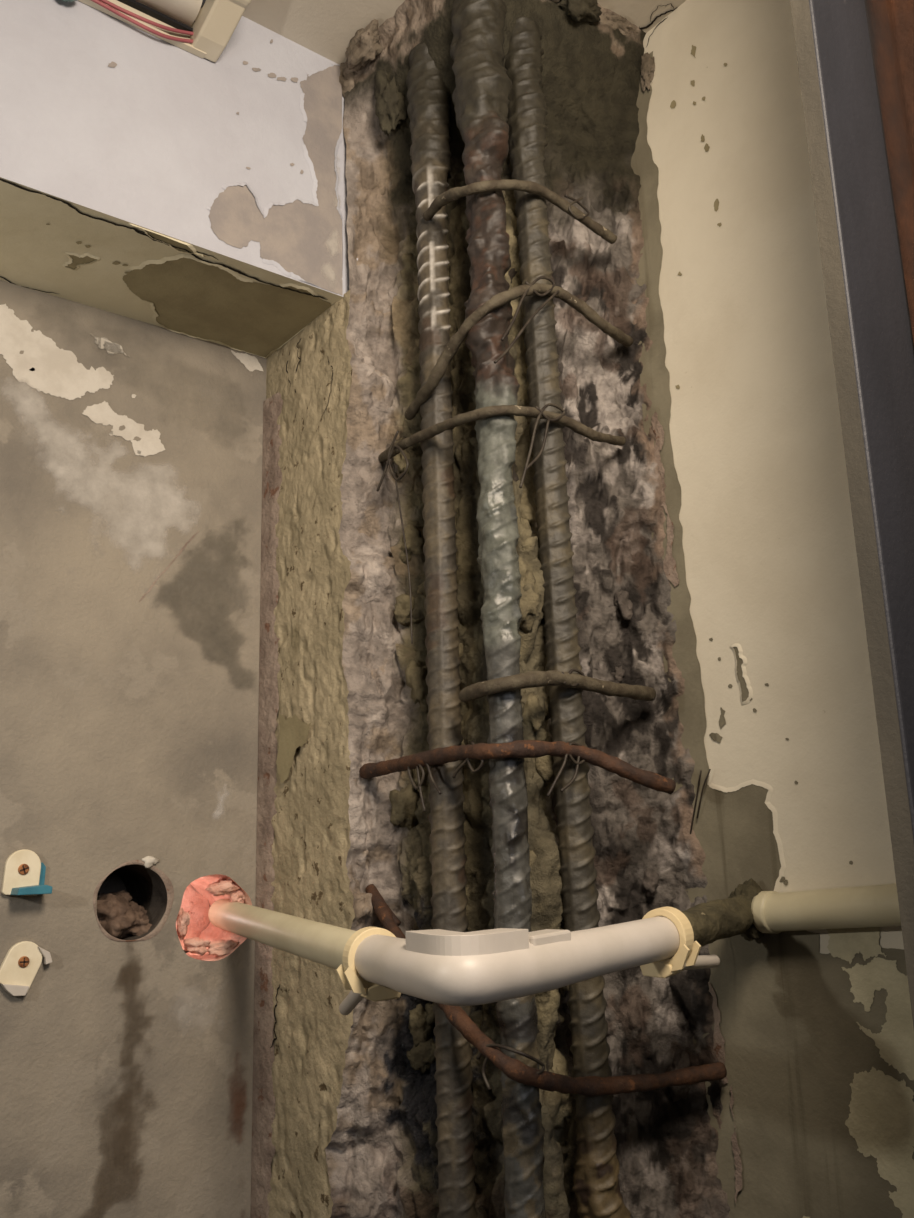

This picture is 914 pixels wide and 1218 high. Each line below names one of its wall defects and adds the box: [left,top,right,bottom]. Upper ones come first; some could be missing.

crack [639,4,678,47]
peeling [0,304,165,457]
spalling [62,0,495,942]
spalling [501,0,788,931]
spalling [325,993,439,1218]
spalling [469,1002,505,1218]
spalling [535,985,574,1078]
spalling [539,1089,578,1218]
peeling [603,930,914,1218]